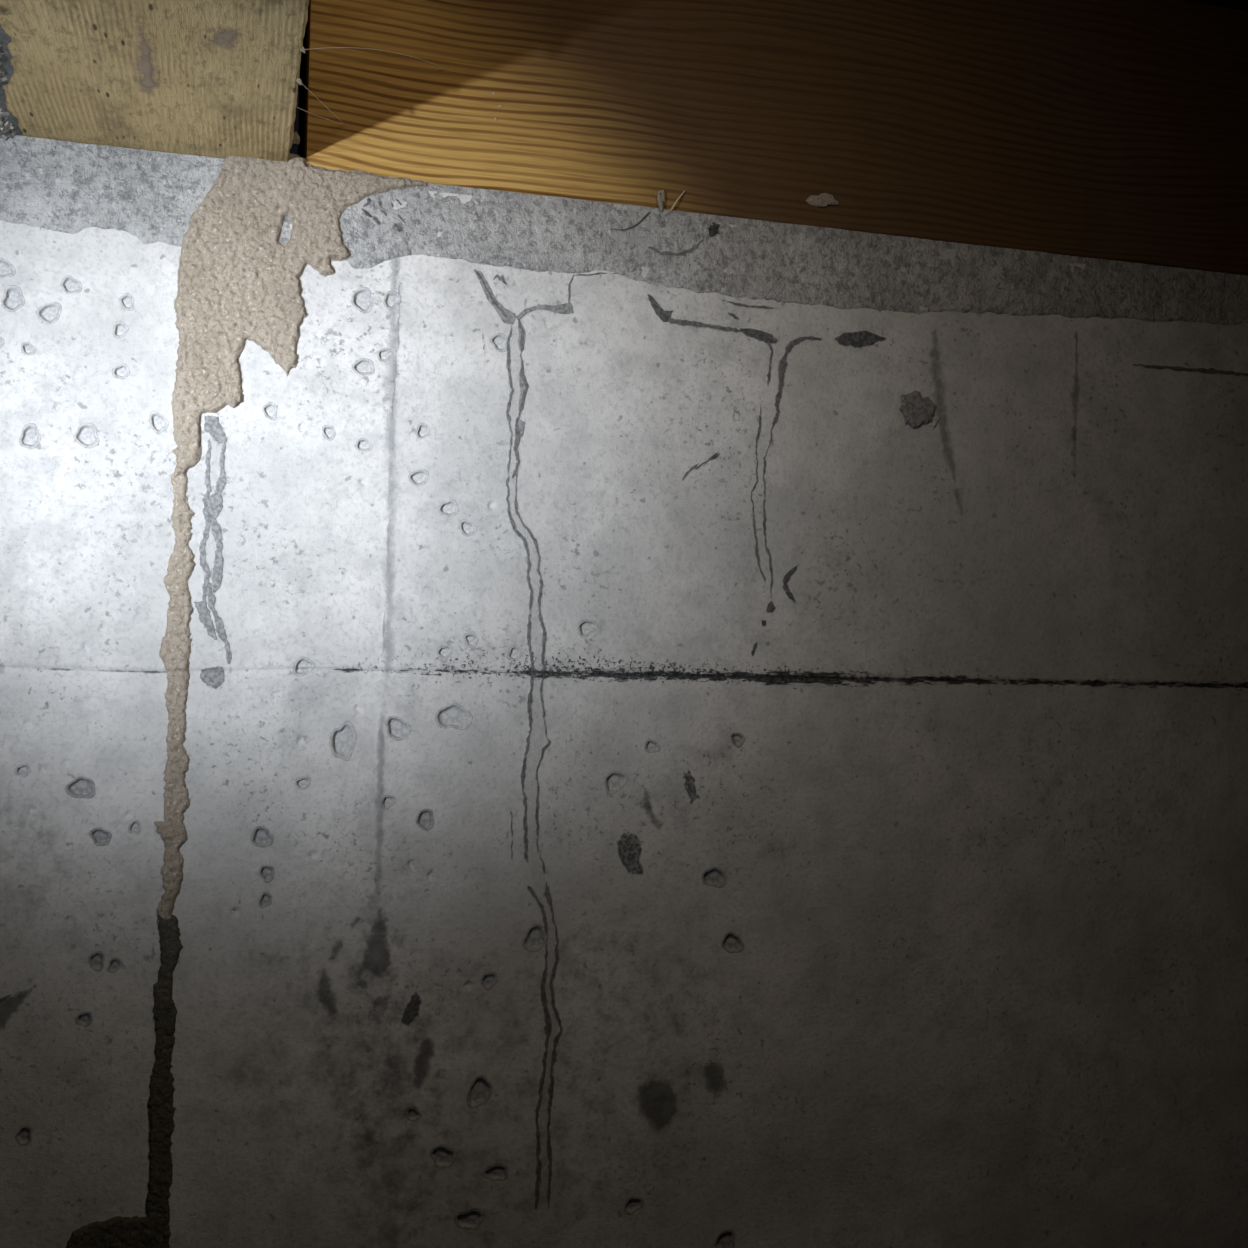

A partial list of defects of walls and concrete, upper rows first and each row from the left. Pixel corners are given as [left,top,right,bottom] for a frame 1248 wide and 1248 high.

leakage [66,915,183,1248]
crack [323,269,1248,1208]